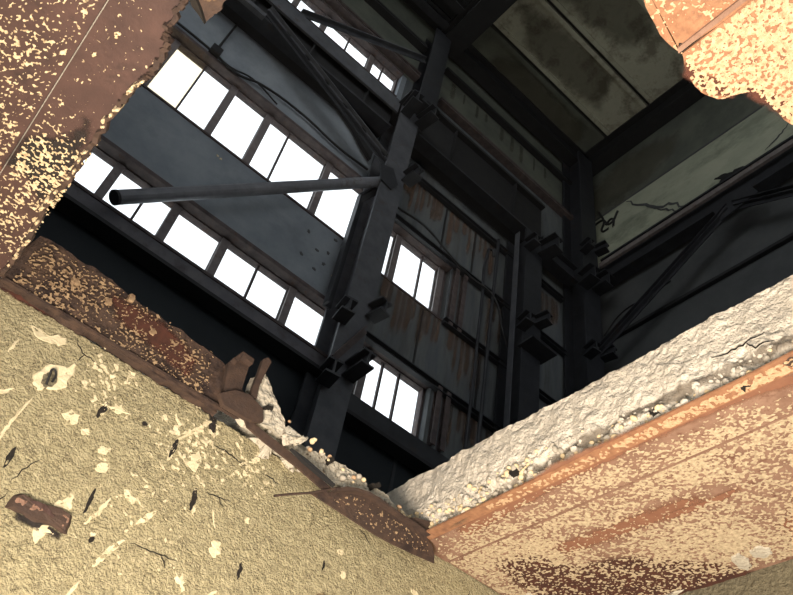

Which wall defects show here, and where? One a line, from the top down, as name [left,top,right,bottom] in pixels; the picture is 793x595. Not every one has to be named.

peeling [645,0,793,125]
rust [684,62,793,117]
peeling [0,0,214,393]
crack [626,201,684,212]
rust [112,296,195,376]
crack [712,332,775,358]
spalling [226,275,793,595]
rust [456,357,793,535]
spalling [54,492,75,511]
spalling [189,488,197,513]
rust [557,489,738,555]
rust [498,557,751,595]